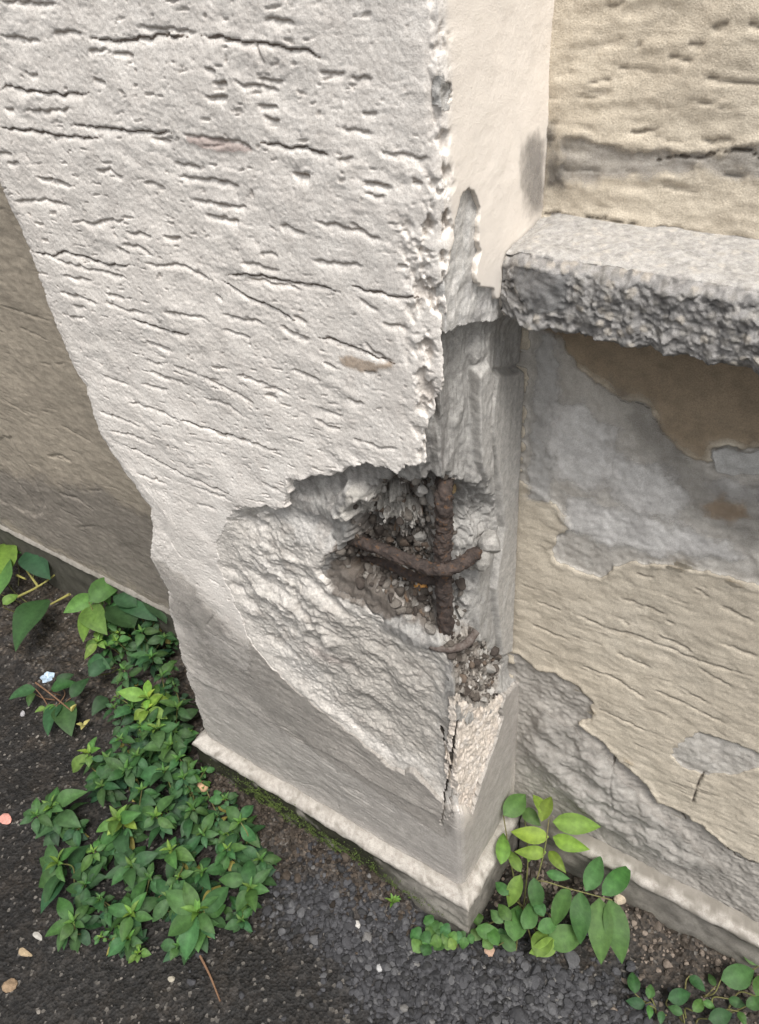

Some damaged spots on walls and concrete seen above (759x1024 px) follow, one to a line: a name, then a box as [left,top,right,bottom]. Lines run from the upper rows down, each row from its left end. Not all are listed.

crack [92,33,321,58]
crack [2,84,89,97]
crack [2,124,172,139]
crack [260,142,327,155]
crack [36,250,129,267]
crack [227,273,419,321]
crack [318,336,395,364]
spalling [216,189,759,923]
rust [327,549,398,619]
crack [440,720,458,813]